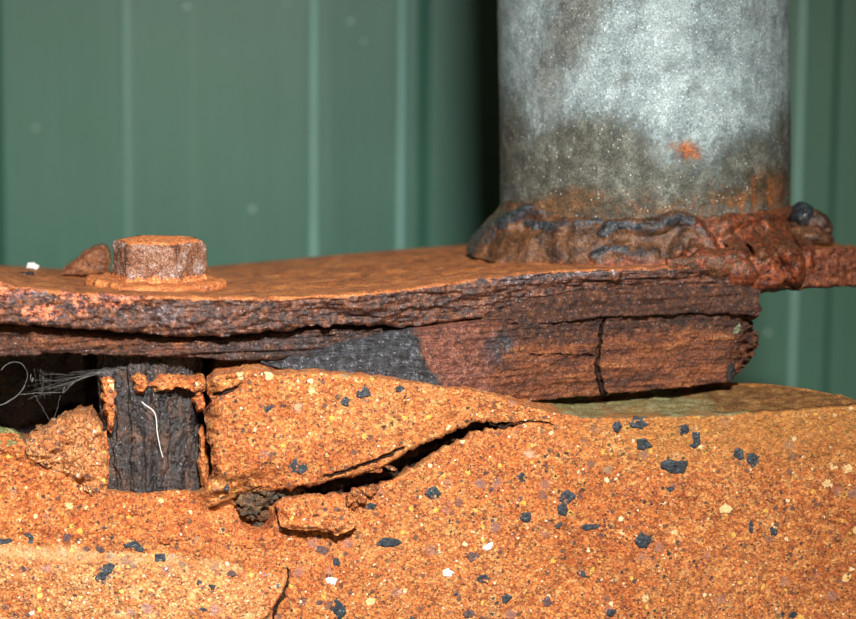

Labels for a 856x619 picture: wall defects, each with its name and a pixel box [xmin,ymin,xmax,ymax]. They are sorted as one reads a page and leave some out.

corrosion [678,143,699,158]
crack [533,319,608,396]
spalling [0,404,285,549]
crack [297,419,554,495]
crack [272,568,290,619]